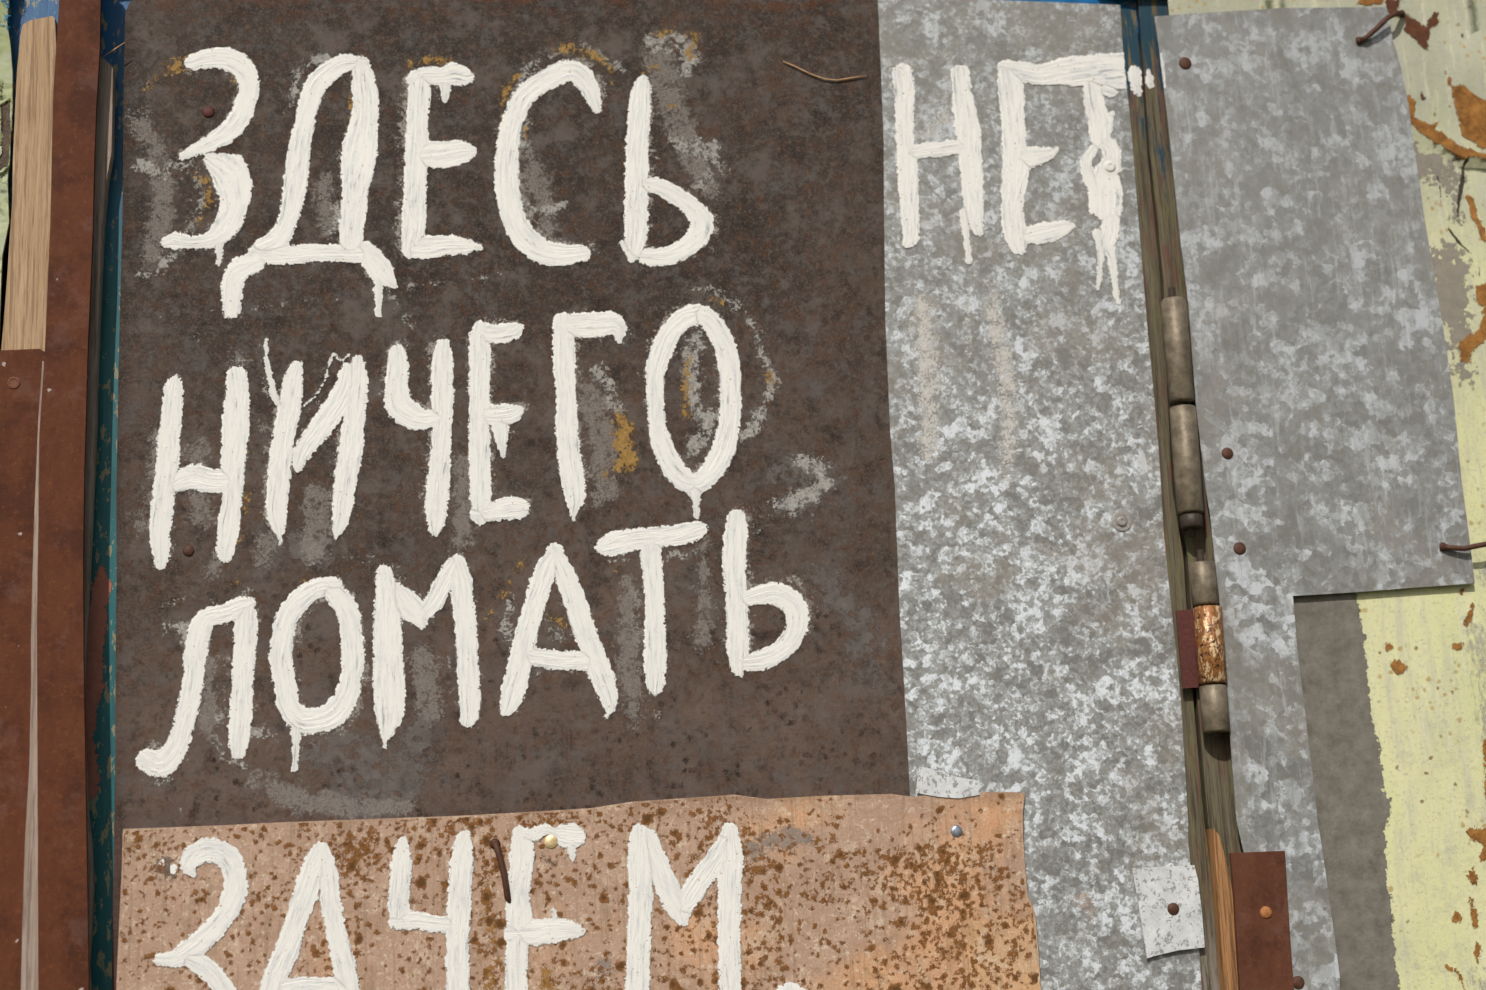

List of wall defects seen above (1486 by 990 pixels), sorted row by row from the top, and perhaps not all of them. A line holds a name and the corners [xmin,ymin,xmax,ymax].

peeling [0,79,13,176]
rust [1407,73,1486,160]
rust [1465,195,1486,242]
rust [1458,283,1486,363]
rust [1385,644,1408,674]
rust [1452,588,1474,650]
rust [1451,826,1486,964]